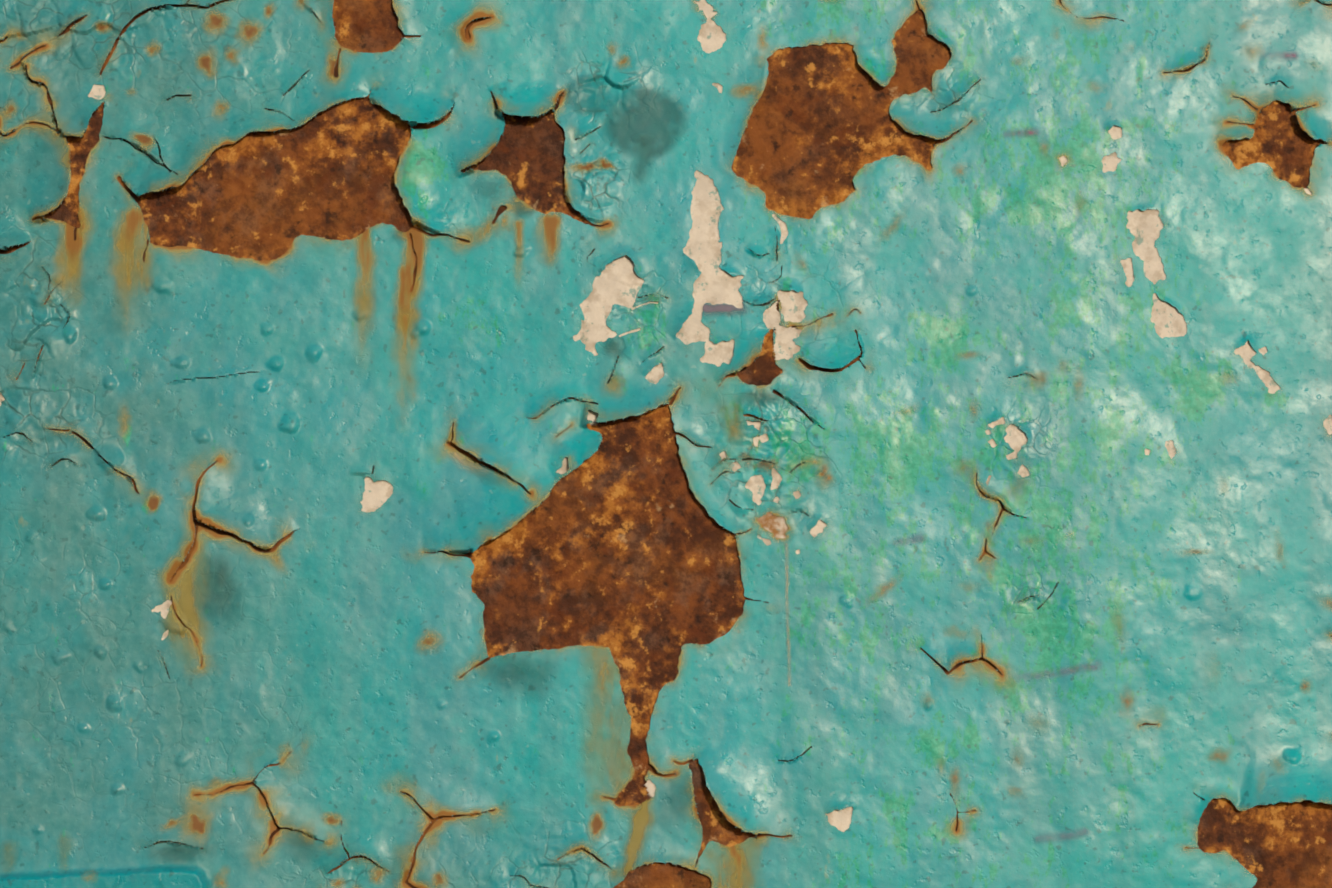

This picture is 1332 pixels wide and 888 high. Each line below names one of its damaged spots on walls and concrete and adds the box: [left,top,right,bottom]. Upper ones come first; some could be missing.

crack [0,107,57,146]
rust [116,0,614,354]
rust [731,0,972,219]
peeling [573,250,659,356]
peeling [671,170,744,367]
peeling [763,286,808,360]
peeling [1121,208,1187,338]
crack [158,454,299,679]
rust [422,377,792,888]
crack [920,635,1007,683]
crack [190,744,500,888]
rust [1184,756,1332,888]